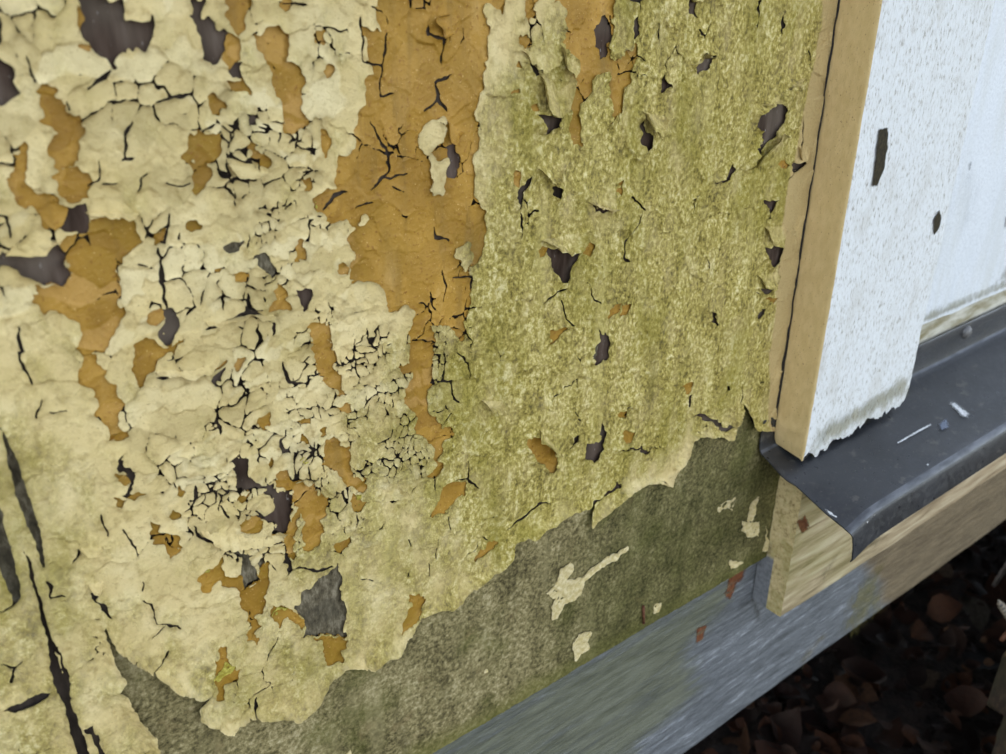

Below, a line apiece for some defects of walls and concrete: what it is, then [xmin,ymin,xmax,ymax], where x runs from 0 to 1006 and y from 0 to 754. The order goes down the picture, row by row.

crack [87,70,111,90]
peeling [66,0,164,76]
crack [87,121,190,192]
crack [322,122,408,210]
peeling [712,78,806,189]
peeling [0,51,193,515]
crack [137,213,170,307]
peeling [172,0,669,524]
crack [16,326,67,419]
crack [282,362,319,387]
peeling [96,231,780,754]
peeling [0,419,103,754]